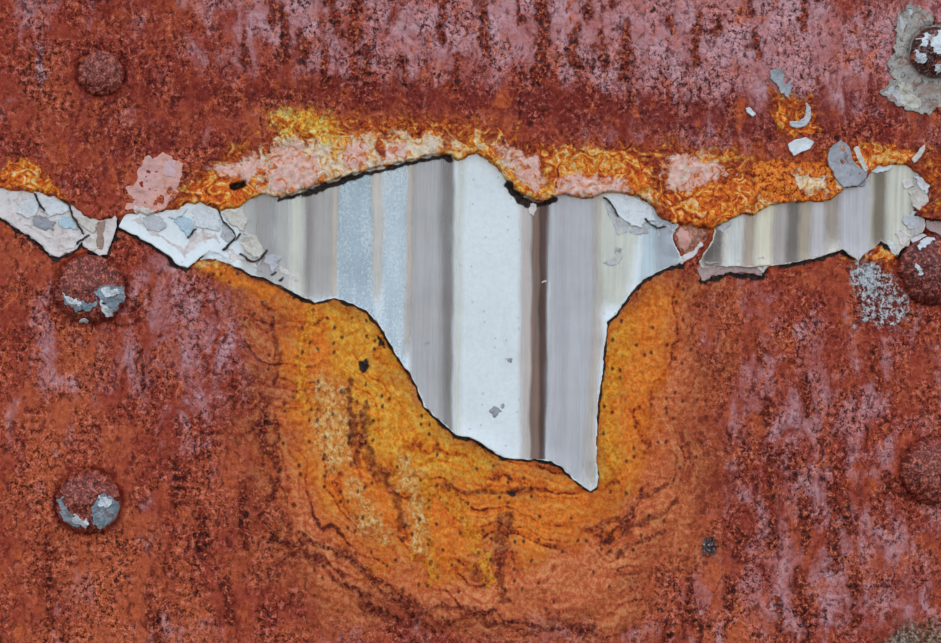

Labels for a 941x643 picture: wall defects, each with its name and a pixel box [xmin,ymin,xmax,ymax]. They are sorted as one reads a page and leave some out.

corrosion [0,156,67,200]
corrosion [228,0,341,93]
corrosion [164,107,848,234]
corrosion [564,0,636,84]
peeling [770,67,792,98]
corrosion [765,85,822,140]
peeling [788,103,814,156]
corrosion [840,138,941,219]
peeling [879,2,941,115]
peeling [0,140,941,491]
corrosion [194,260,725,643]
peeling [56,493,120,529]